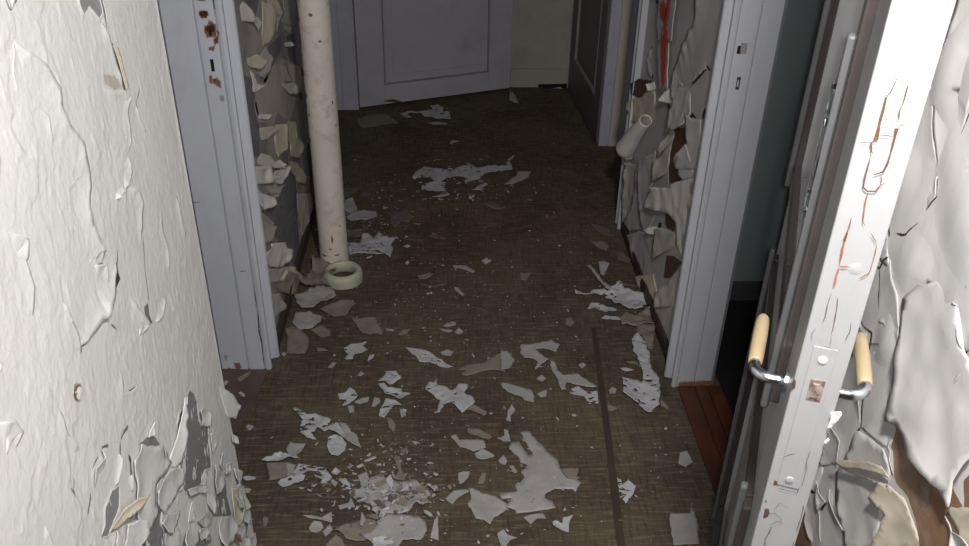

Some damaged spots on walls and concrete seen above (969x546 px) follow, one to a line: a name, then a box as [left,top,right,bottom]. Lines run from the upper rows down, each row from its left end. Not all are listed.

corrosion [199,11,219,51]
peeling [942,0,969,49]
peeling [8,40,120,353]
peeling [76,0,146,239]
peeling [240,0,336,356]
peeling [575,0,711,412]
peeling [923,87,948,163]
corrosion [73,384,84,403]
peeling [88,389,269,546]
peeling [219,363,252,419]
peeling [262,371,410,487]
peeling [795,281,969,546]